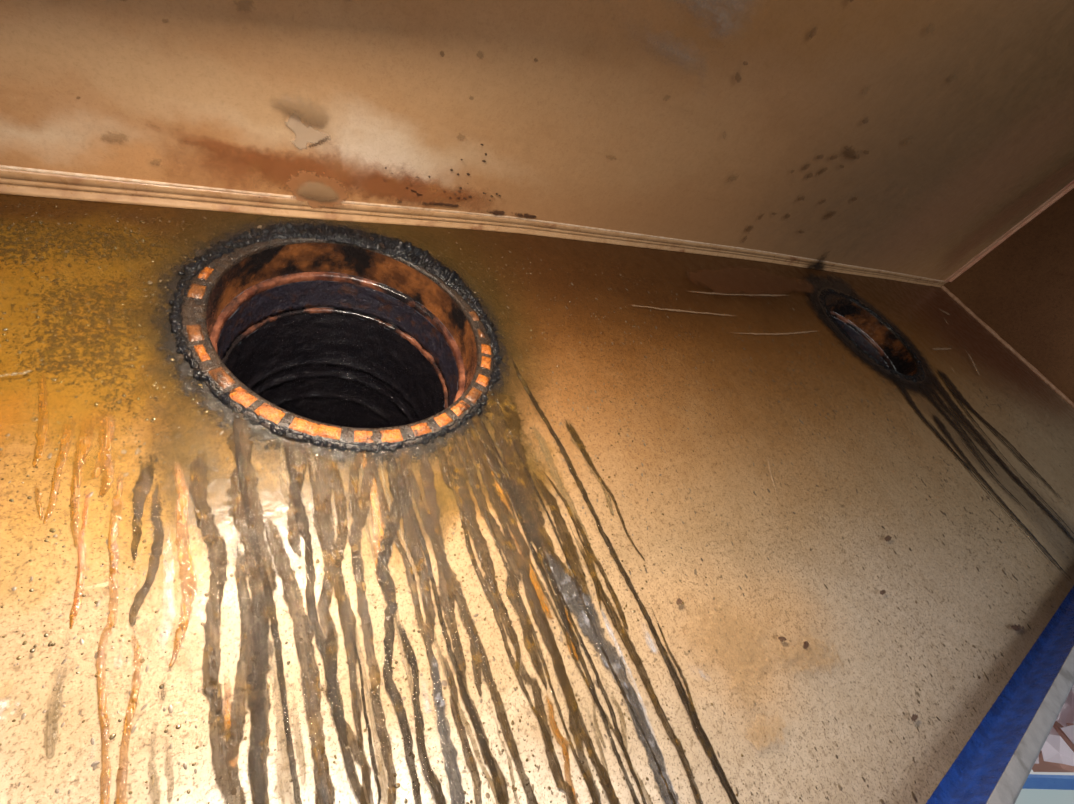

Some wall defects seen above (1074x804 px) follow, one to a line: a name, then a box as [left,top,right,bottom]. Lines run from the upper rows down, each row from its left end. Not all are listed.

peeling [287,115,330,149]
corrosion [190,139,479,202]
leakage [32,376,49,468]
leakage [892,366,1074,574]
leakage [35,361,739,804]